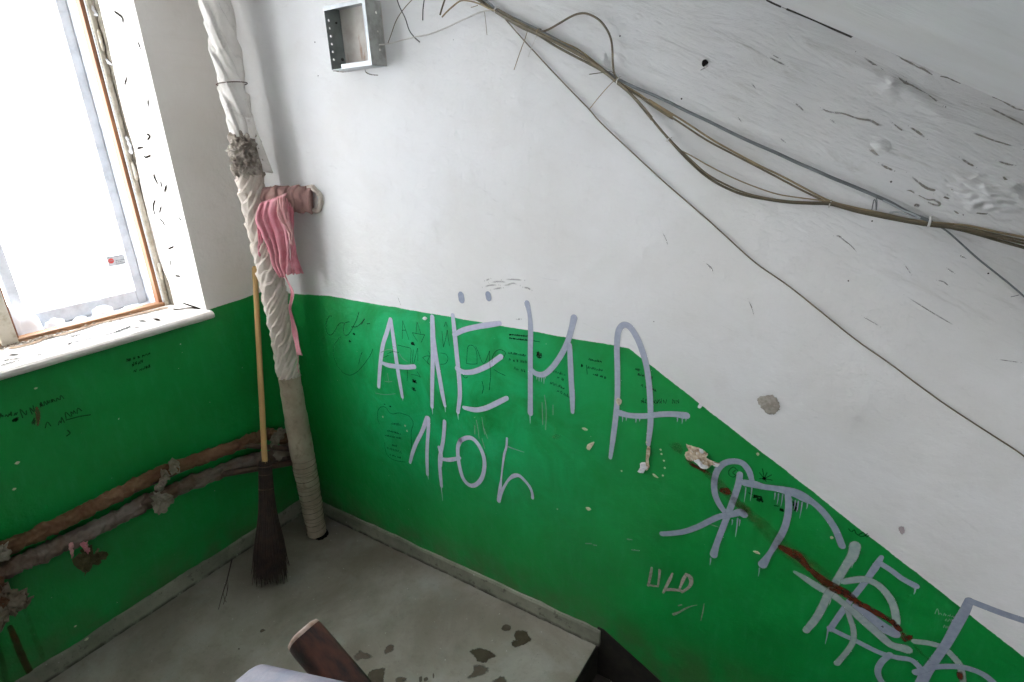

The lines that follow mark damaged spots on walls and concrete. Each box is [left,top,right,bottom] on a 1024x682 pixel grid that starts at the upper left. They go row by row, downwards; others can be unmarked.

rust [778,545,913,642]